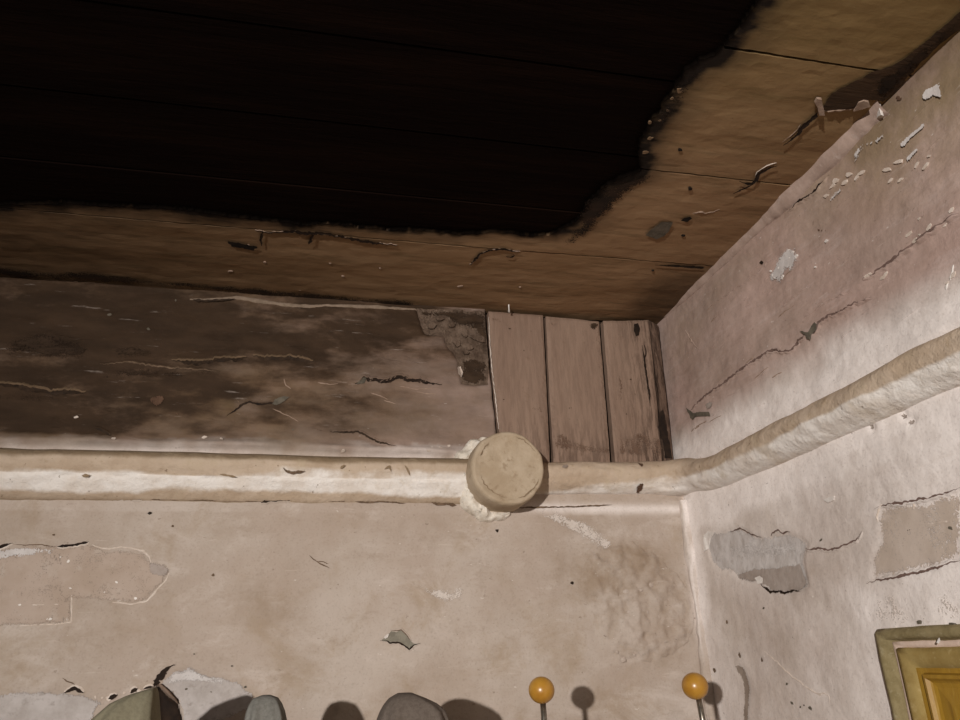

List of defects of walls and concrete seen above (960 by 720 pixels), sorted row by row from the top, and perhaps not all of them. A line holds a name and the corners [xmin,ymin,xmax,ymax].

crack [735,113,818,193]
peeling [823,170,865,201]
peeling [882,124,931,183]
crack [470,248,520,265]
spalling [190,296,489,386]
crack [690,207,960,411]
crack [100,354,442,421]
peeling [0,534,169,626]
spalling [703,527,807,594]
peeling [874,496,960,576]
spalling [380,628,420,652]
peeling [0,667,252,720]